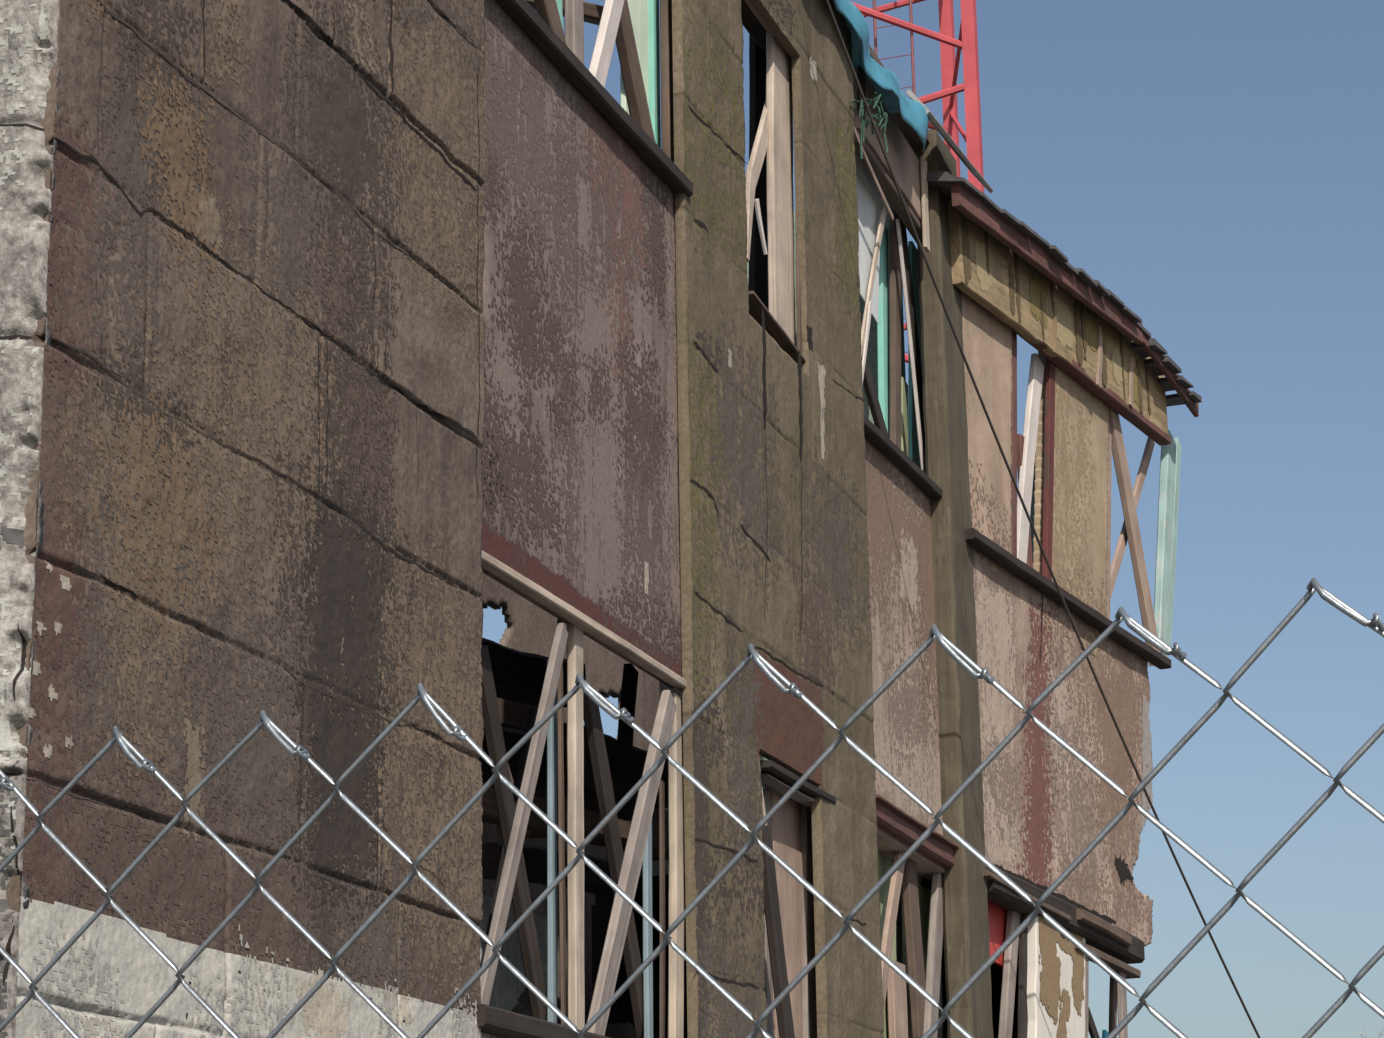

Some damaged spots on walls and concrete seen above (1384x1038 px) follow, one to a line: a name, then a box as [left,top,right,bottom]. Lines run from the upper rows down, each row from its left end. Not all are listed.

damp [373,0,768,1038]
crack [101,574,138,598]
crack [13,623,28,700]
rust [1003,596,1059,887]
spalling [1140,694,1153,831]
crack [0,773,159,985]
spalling [1115,855,1134,886]
peeling [295,967,350,1038]
peeling [1039,916,1084,1038]